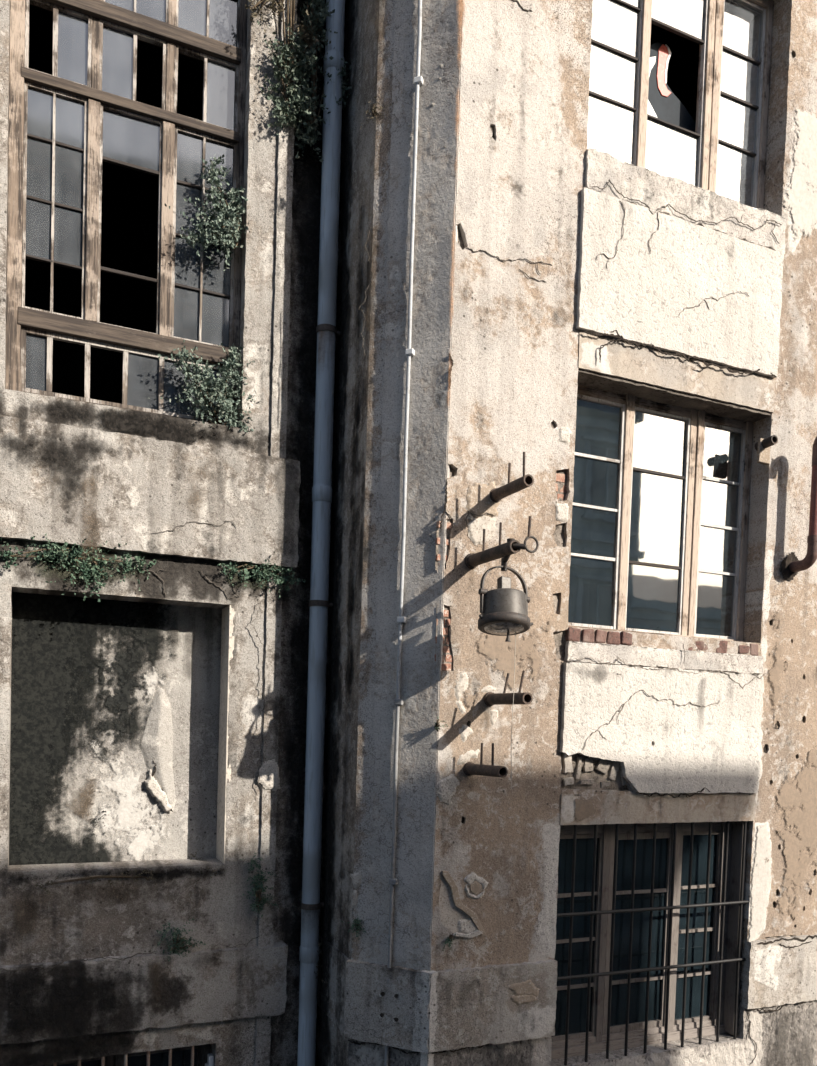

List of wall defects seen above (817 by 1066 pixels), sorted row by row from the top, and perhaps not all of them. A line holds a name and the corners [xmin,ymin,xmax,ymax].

peeling [784,109,817,241]
crack [466,246,551,282]
crack [592,179,782,268]
crack [679,291,749,315]
leakage [1,402,250,506]
leakage [33,515,132,580]
crack [575,644,766,750]
leakage [9,592,224,900]
spalling [561,752,629,791]
peeling [439,871,486,938]
crack [757,935,817,948]
leakage [0,967,133,1066]